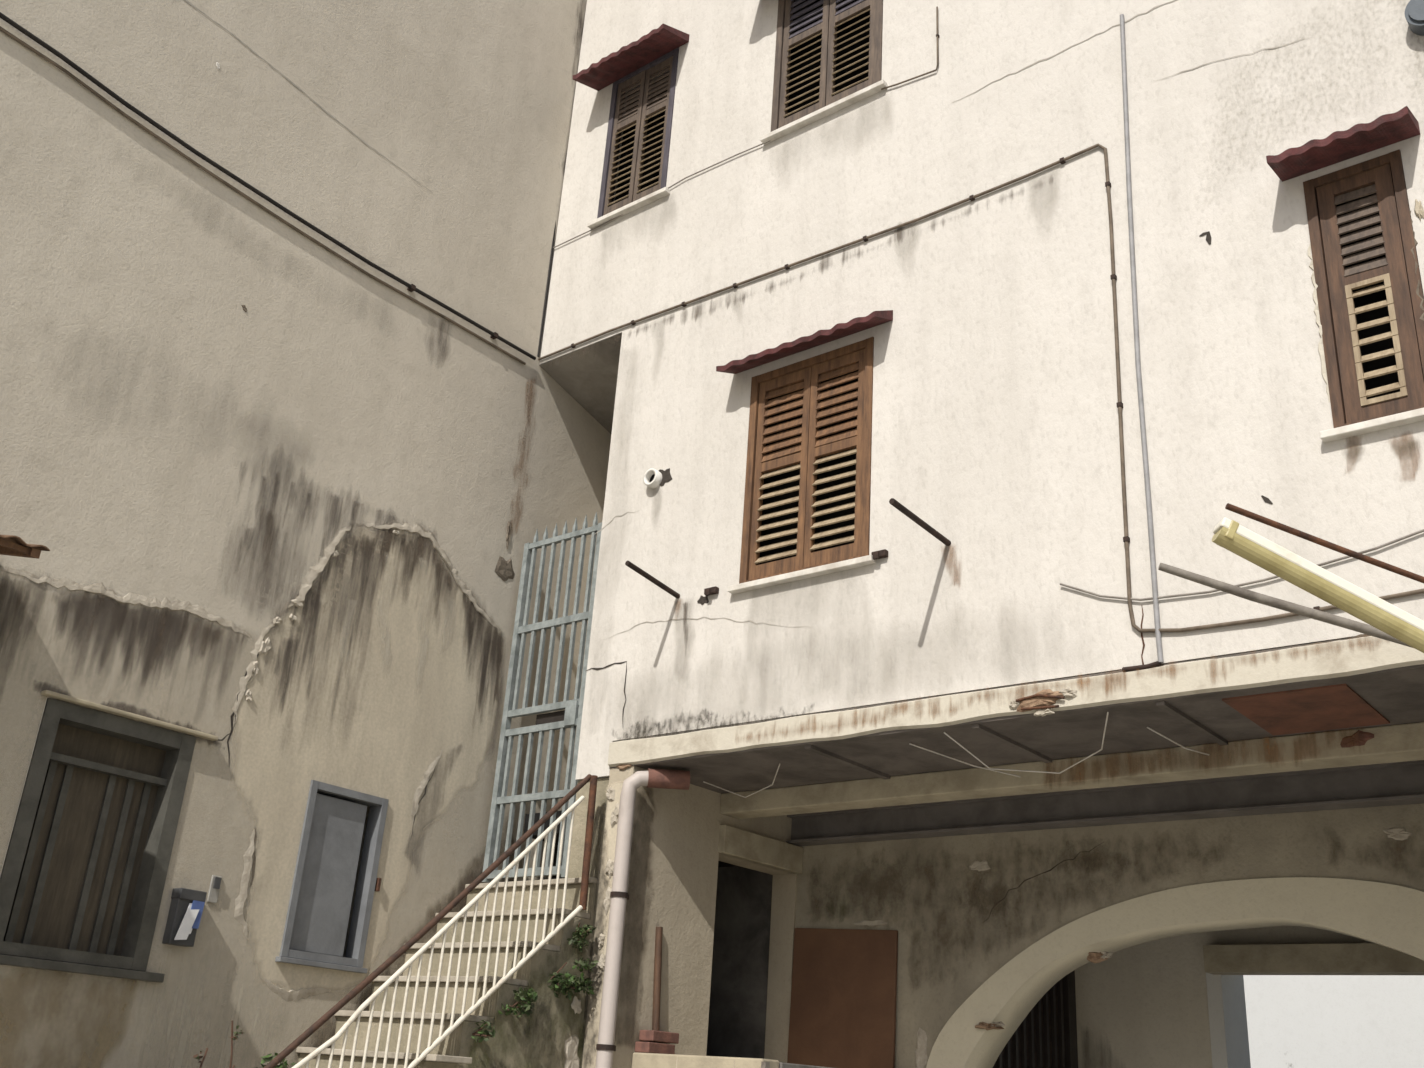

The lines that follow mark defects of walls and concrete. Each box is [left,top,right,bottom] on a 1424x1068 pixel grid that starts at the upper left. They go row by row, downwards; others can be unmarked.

leakage [261,457,290,594]
leakage [61,594,231,676]
leakage [281,567,352,698]
leakage [328,497,502,711]
crack [218,637,265,764]
spalling [1009,688,1077,717]
spalling [1340,730,1374,748]
crack [249,827,257,886]